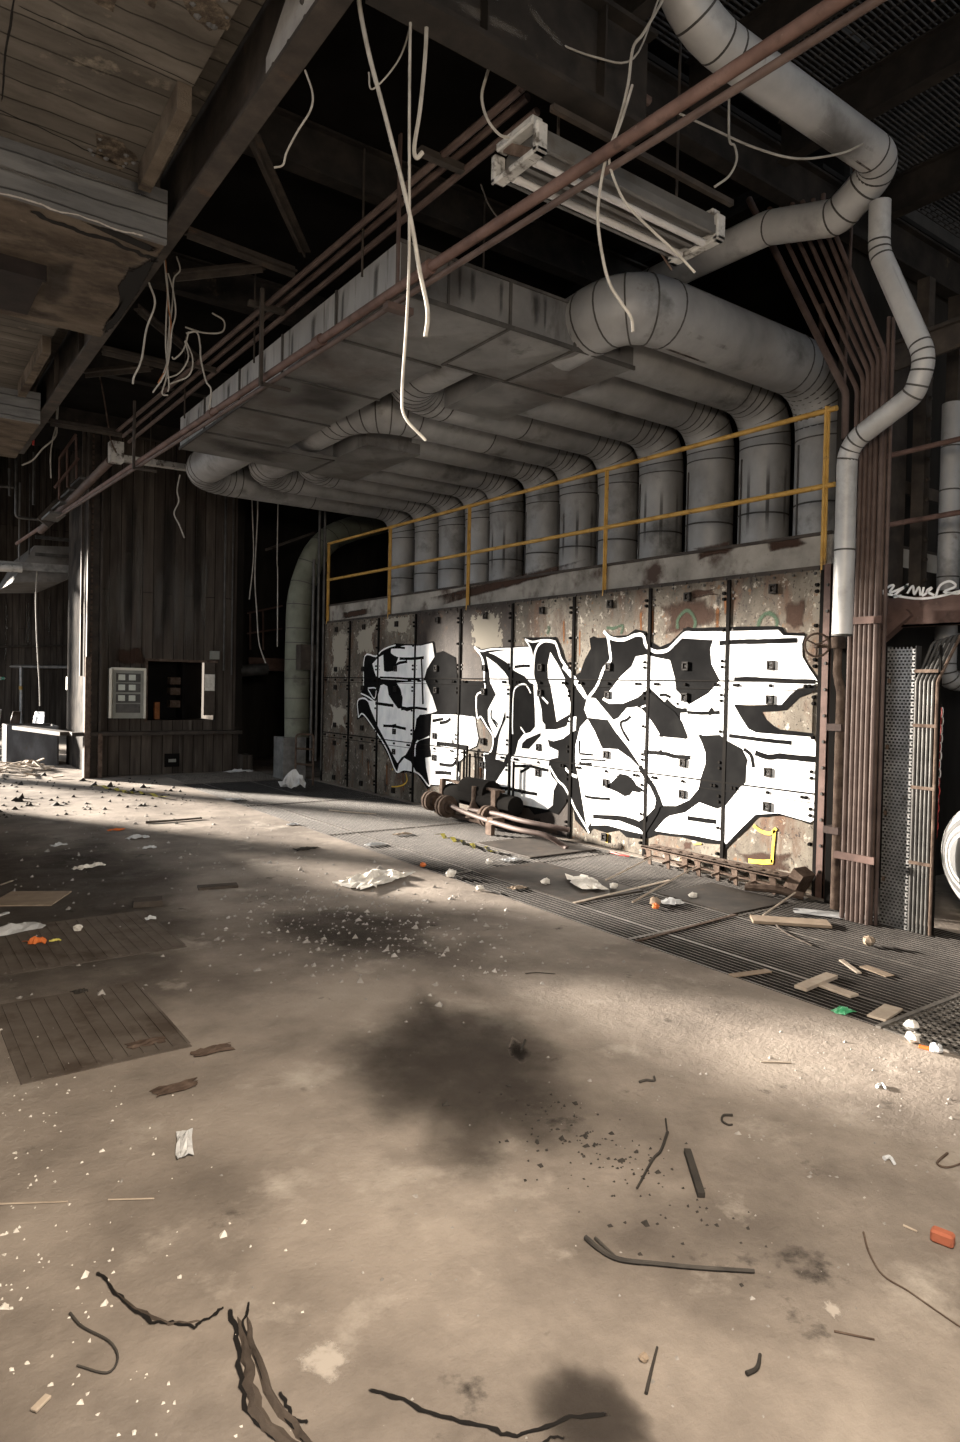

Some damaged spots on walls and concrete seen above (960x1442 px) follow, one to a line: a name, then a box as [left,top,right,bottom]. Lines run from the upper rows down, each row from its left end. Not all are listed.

crack [0,0,194,173]
crack [96,1272,312,1442]
crack [369,1388,606,1442]